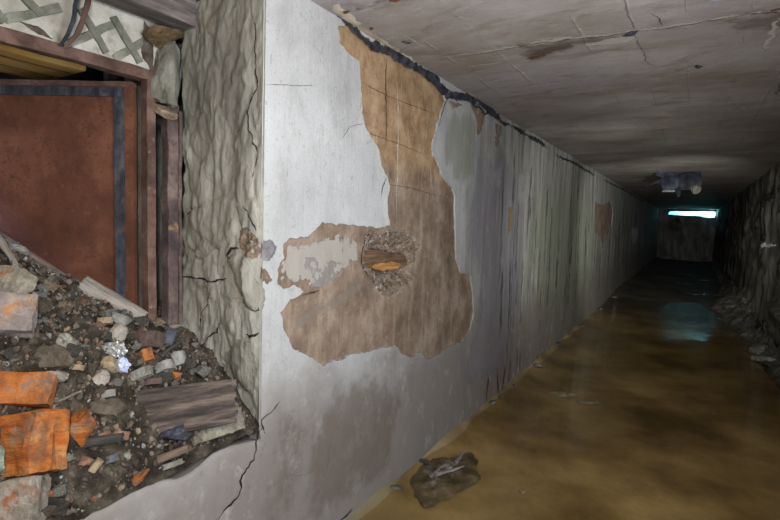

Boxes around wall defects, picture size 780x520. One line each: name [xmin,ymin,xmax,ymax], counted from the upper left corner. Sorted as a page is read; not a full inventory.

crack [246,18,312,177]
crack [337,15,641,200]
leakage [585,36,635,46]
crack [457,0,780,67]
peeling [239,25,485,365]
peeling [595,202,613,243]
crack [218,401,280,519]